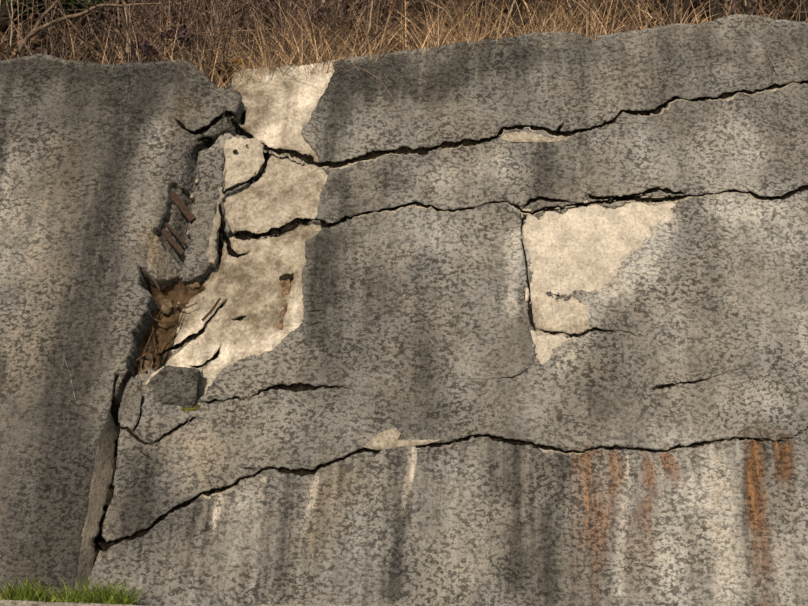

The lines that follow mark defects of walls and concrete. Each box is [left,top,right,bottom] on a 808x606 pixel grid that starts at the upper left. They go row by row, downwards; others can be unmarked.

crack [157,300,246,357]
crack [189,346,221,368]
spalling [134,60,335,397]
rust [277,273,294,330]
crack [175,56,808,337]
spalling [521,193,676,365]
crack [654,365,749,389]
crack [91,374,379,570]
rust [574,451,621,565]
crack [415,427,808,456]
rust [640,452,678,515]
rust [745,439,768,574]